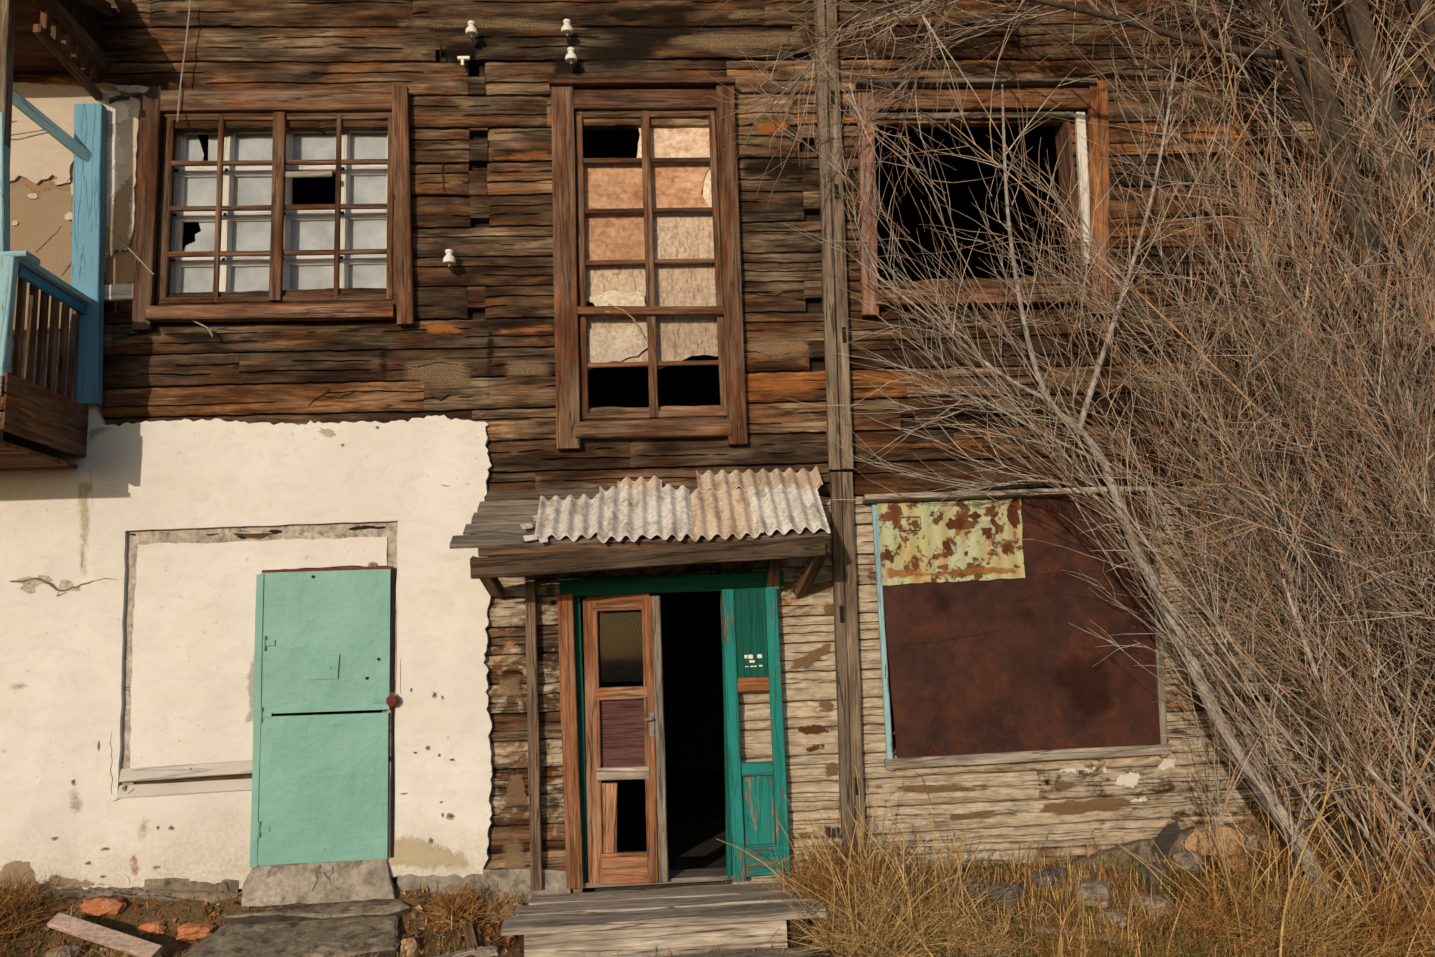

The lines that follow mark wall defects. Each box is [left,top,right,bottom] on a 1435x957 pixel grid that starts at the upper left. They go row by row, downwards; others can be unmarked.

peeling [105,85,149,259]
peeling [10,178,73,285]
peeling [12,278,70,336]
crack [10,575,114,597]
rust [883,494,1161,758]